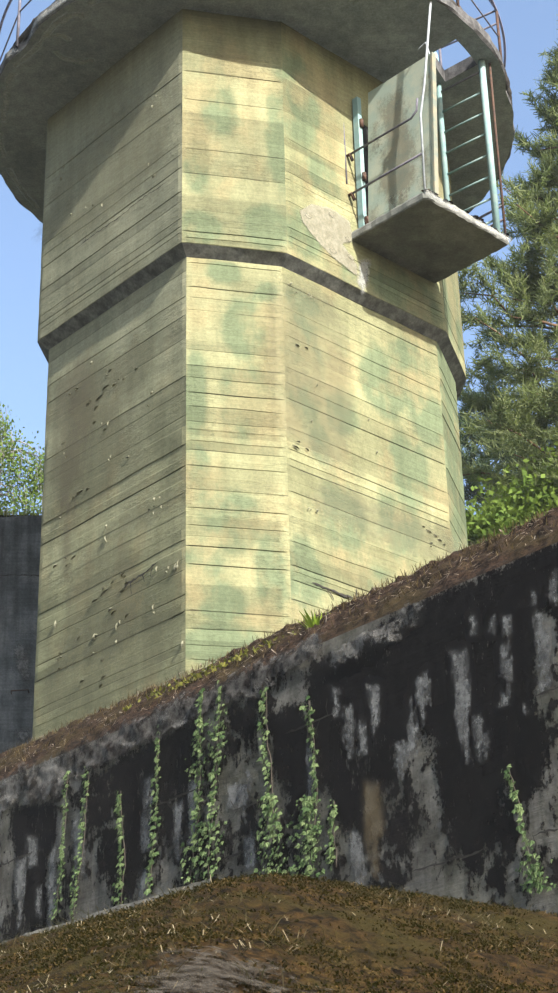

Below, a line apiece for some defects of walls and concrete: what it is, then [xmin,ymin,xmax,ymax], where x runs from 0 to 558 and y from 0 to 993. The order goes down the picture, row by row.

damp [0,542,558,943]